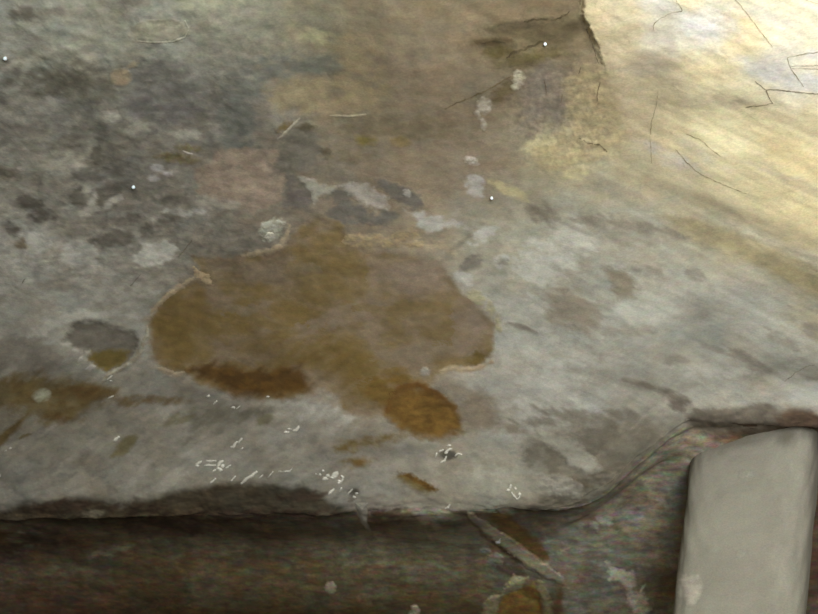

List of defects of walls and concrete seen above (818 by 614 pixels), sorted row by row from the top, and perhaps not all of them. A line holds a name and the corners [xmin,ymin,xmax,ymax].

damp [284,53,347,78]
crack [445,0,600,110]
damp [464,1,635,175]
crack [736,1,818,108]
damp [266,118,335,214]
crack [675,134,747,194]
damp [336,176,427,228]
damp [86,346,133,374]
spalling [483,506,556,566]